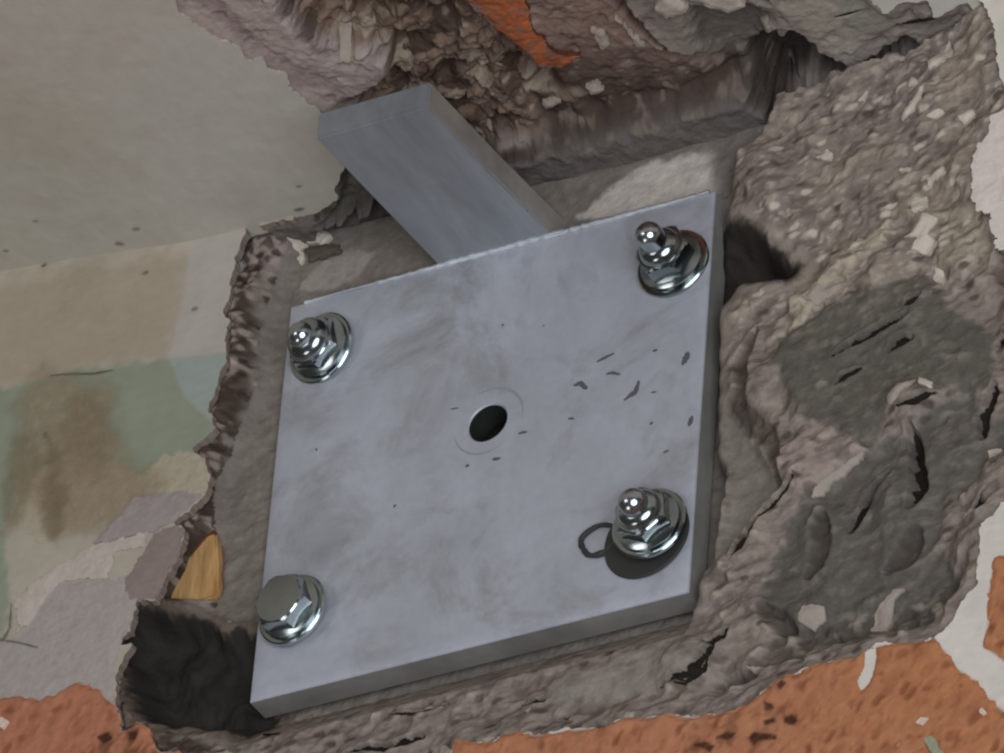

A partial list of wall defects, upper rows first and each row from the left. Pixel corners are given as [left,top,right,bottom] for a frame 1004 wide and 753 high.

spalling [176,0,1004,717]
peeling [0,233,283,706]
spalling [119,619,691,753]
crack [660,628,728,688]
spalling [695,732,734,751]
spalling [749,732,776,744]
peeling [916,717,944,753]